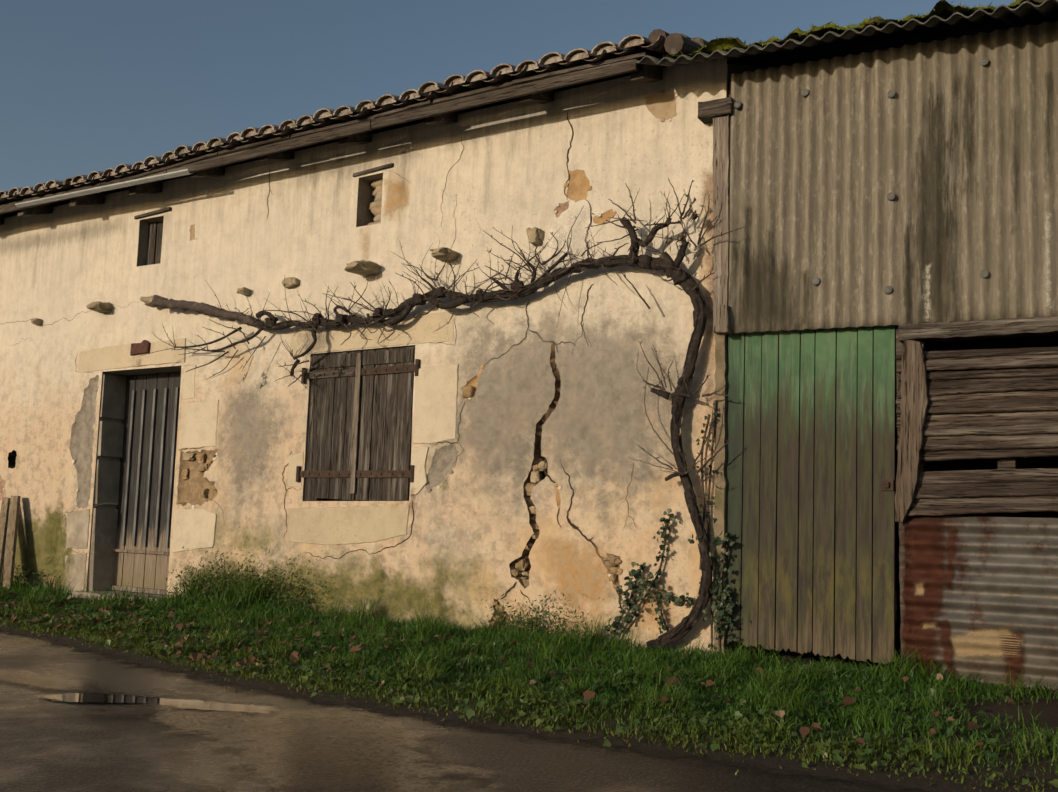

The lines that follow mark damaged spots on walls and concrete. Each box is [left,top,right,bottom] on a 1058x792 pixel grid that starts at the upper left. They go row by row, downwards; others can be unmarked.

flaking render [645,90,679,122]
flaking render [554,170,592,218]
crack [564,112,595,257]
water stain [904,94,956,322]
spalling [0,450,17,500]
spalling [69,375,99,509]
spalling [176,448,218,509]
spalling [425,444,459,493]
crack [617,463,636,530]
crack [543,459,622,611]
corrosion [901,523,957,683]
corrosion [1001,633,1024,690]